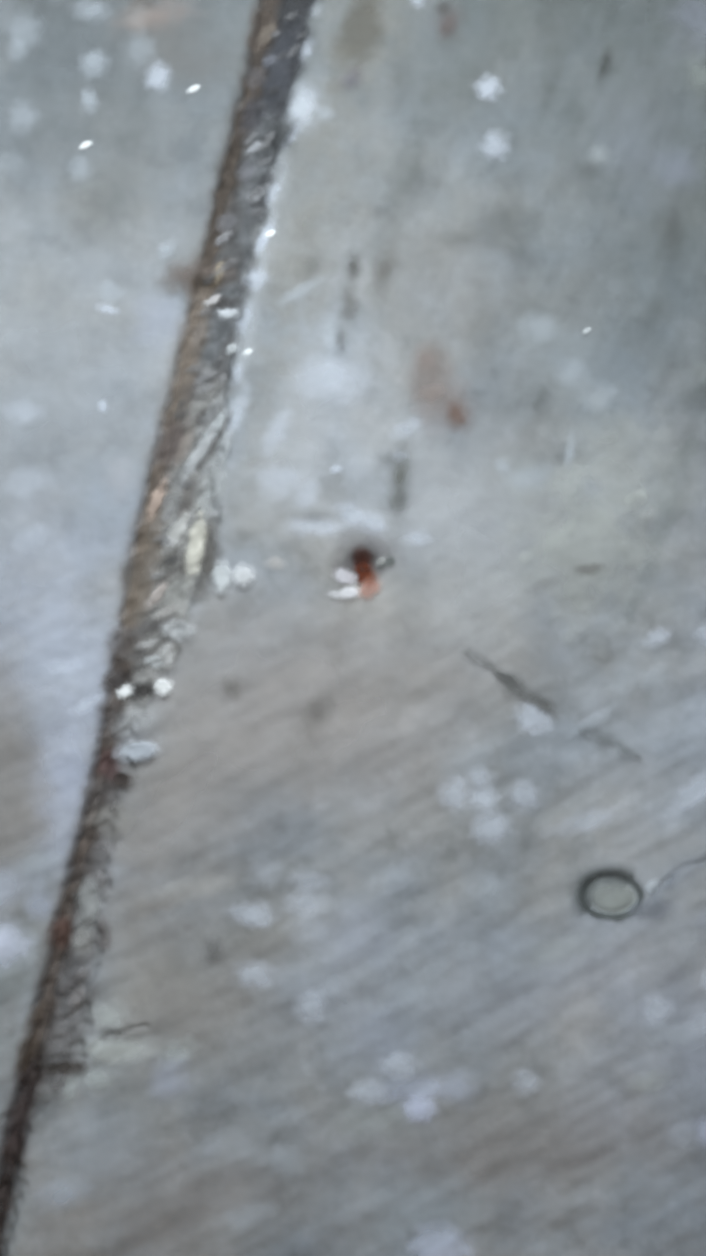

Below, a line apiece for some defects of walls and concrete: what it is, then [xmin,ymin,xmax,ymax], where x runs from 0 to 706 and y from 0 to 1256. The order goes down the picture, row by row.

crack [0,0,313,1256]
corrosion [338,540,394,597]